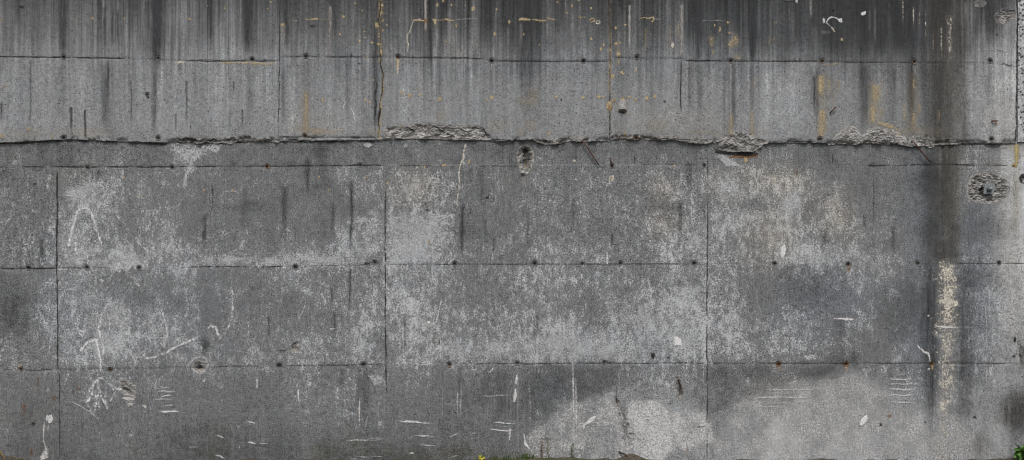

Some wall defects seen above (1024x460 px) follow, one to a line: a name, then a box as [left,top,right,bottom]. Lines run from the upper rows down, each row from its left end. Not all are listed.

leakage [150,0,162,60]
leakage [244,0,254,48]
crack [119,1,761,205]
spalling [384,122,494,141]
spalling [610,130,768,162]
spalling [828,125,961,148]
spalling [966,172,1024,204]
leakage [860,0,971,460]